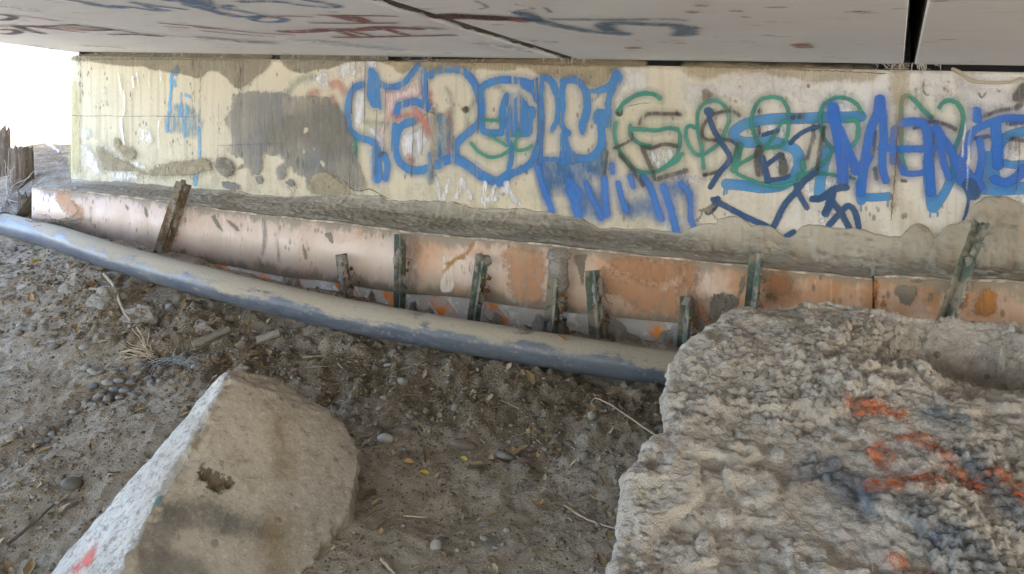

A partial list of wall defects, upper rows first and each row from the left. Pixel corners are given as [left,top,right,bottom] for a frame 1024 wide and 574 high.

rust [56,190,83,221]
rust [963,289,997,316]